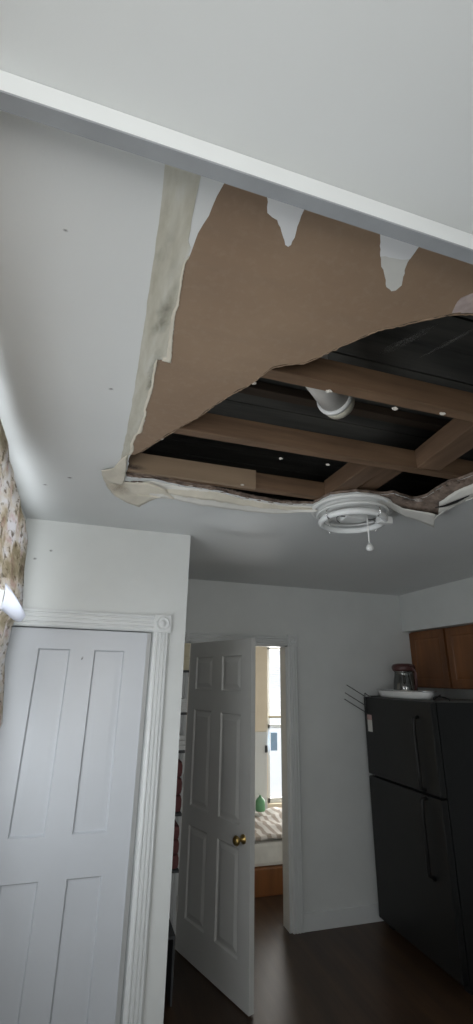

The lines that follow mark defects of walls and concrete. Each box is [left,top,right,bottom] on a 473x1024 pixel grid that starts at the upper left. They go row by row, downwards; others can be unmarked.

peeling [101,183,473,514]
peeling [378,497,473,528]